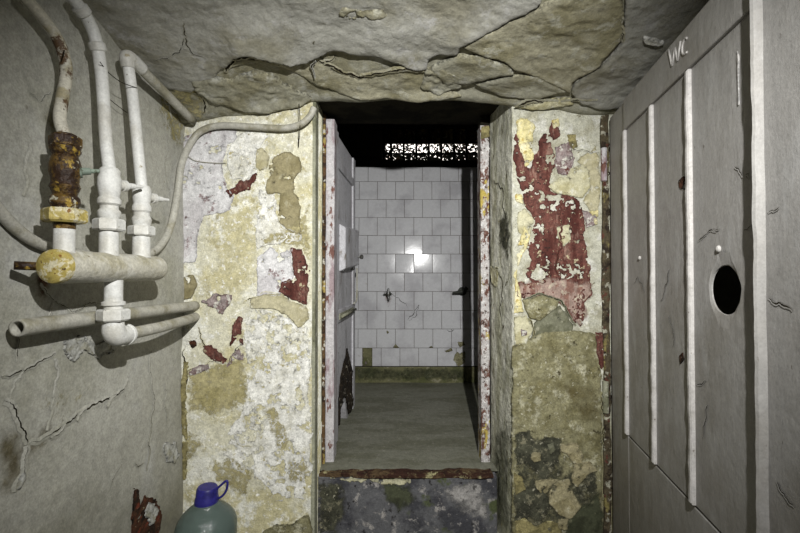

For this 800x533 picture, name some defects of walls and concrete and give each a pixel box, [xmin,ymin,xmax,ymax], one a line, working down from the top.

crack [155,23,207,62]
crack [224,41,425,80]
crack [193,91,209,115]
flaking render [83,0,709,533]
crack [1,337,129,493]